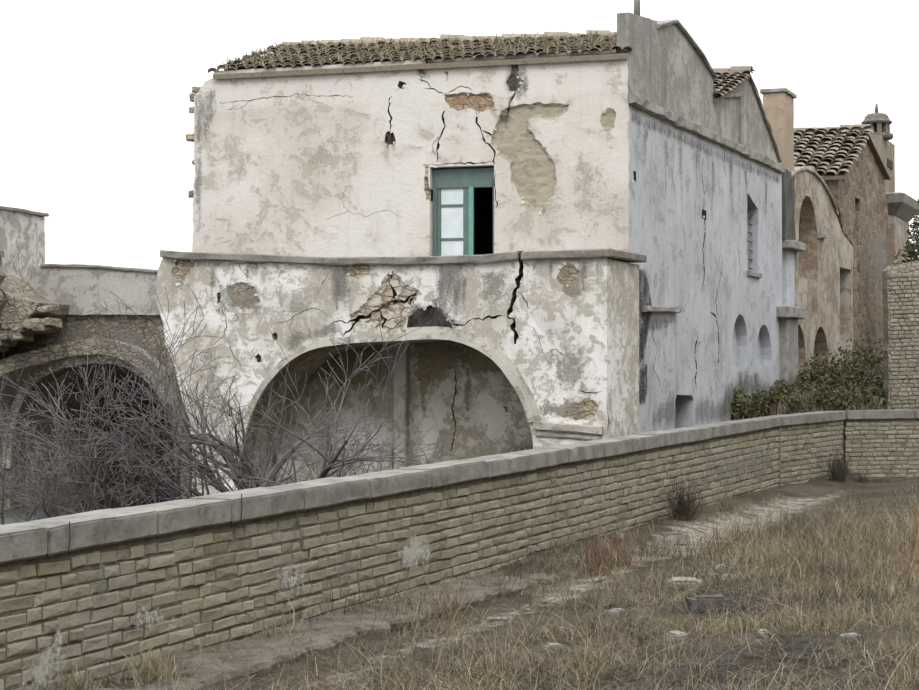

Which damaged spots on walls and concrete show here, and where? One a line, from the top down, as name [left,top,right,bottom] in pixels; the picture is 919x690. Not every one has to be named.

crack [219,93,352,110]
crack [386,96,394,129]
crack [419,79,498,208]
spalling [445,76,569,215]
spalling [600,108,616,133]
spalling [340,265,371,278]
spalling [0,305,63,352]
peeling [212,280,263,320]
spalling [350,271,454,335]
crack [447,251,566,365]
crack [450,368,478,452]
spalling [539,397,599,421]